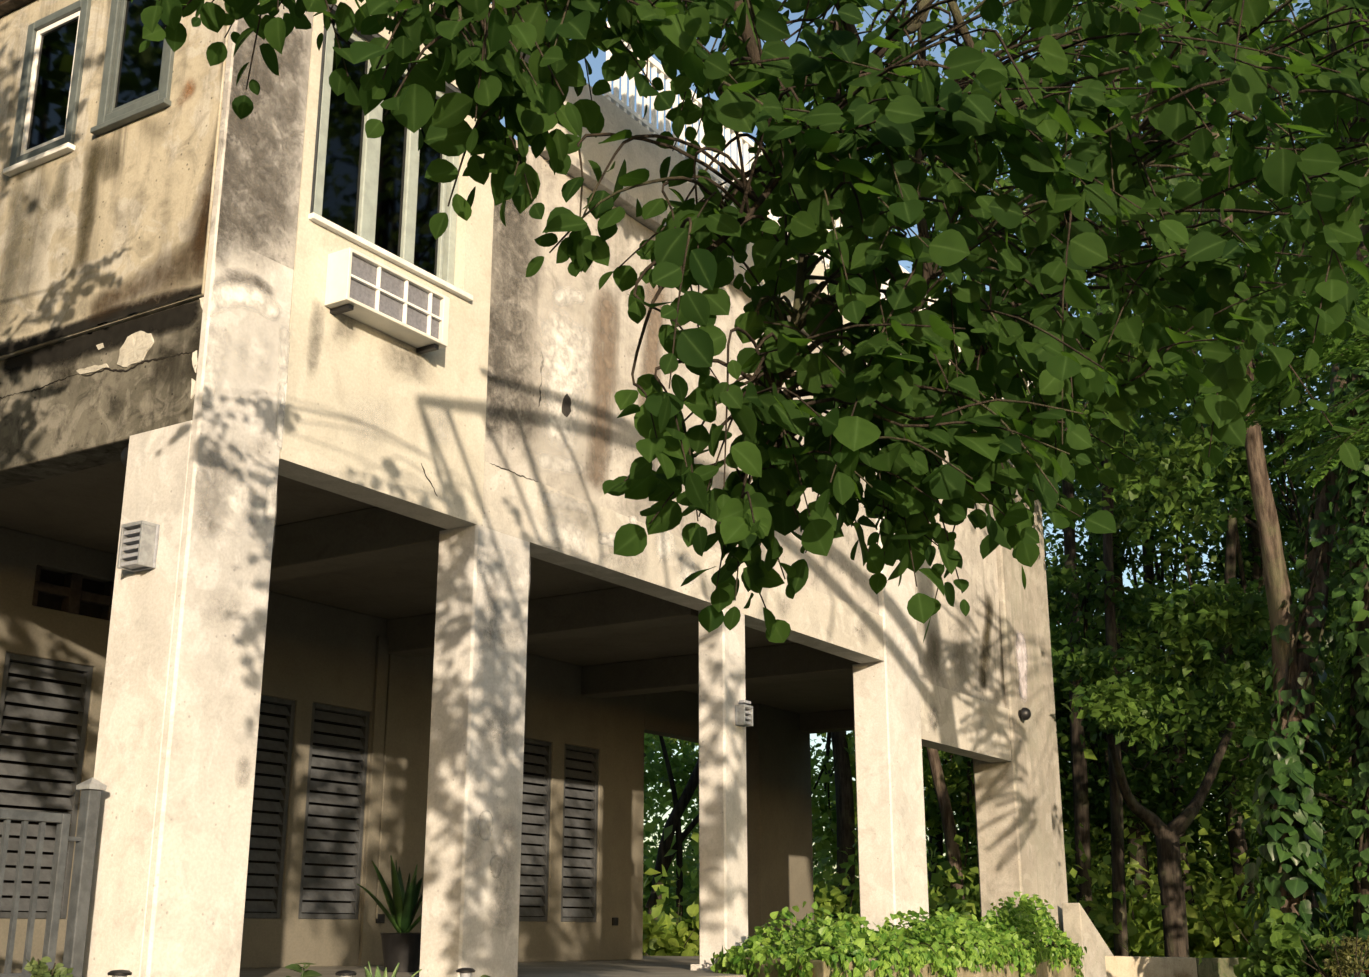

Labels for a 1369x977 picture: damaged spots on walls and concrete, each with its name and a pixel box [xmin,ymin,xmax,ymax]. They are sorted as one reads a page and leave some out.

leakage [0,15,304,387]
crack [0,352,190,399]
spalling [77,331,154,375]
leakage [487,198,535,434]
leakage [590,293,615,485]
leakage [980,598,1005,691]